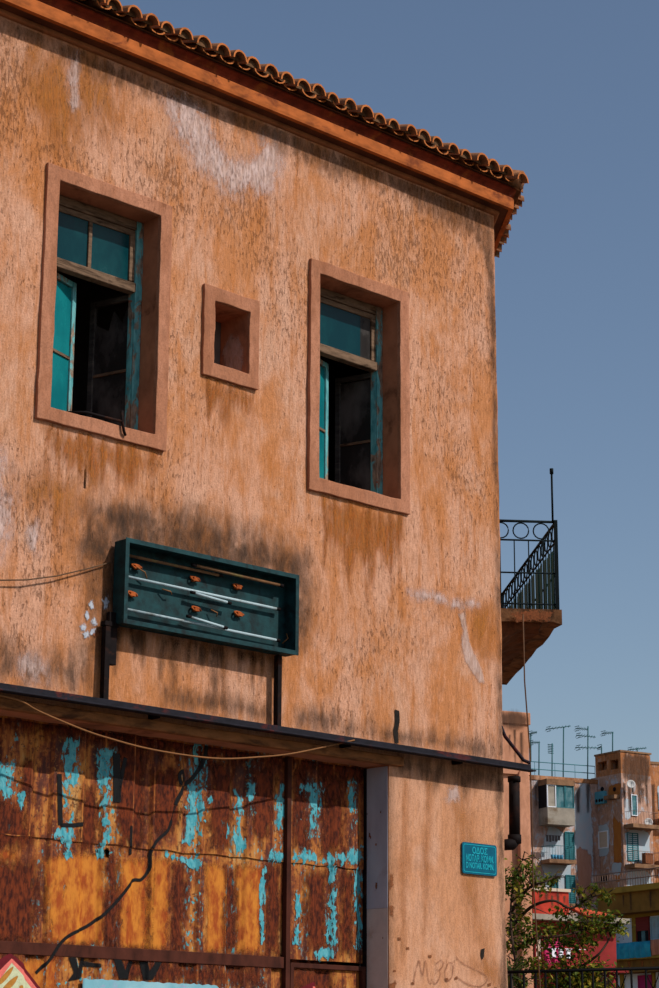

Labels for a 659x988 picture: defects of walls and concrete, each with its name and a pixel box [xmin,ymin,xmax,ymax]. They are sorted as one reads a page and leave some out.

damp [167,93,379,194]
damp [391,177,496,368]
peeling [0,755,26,810]
peeling [51,737,80,860]
peeling [96,747,117,861]
corrosion [0,718,364,954]
peeling [165,744,213,870]
corrosion [95,864,283,987]
peeling [226,782,256,855]
peeling [259,779,377,961]